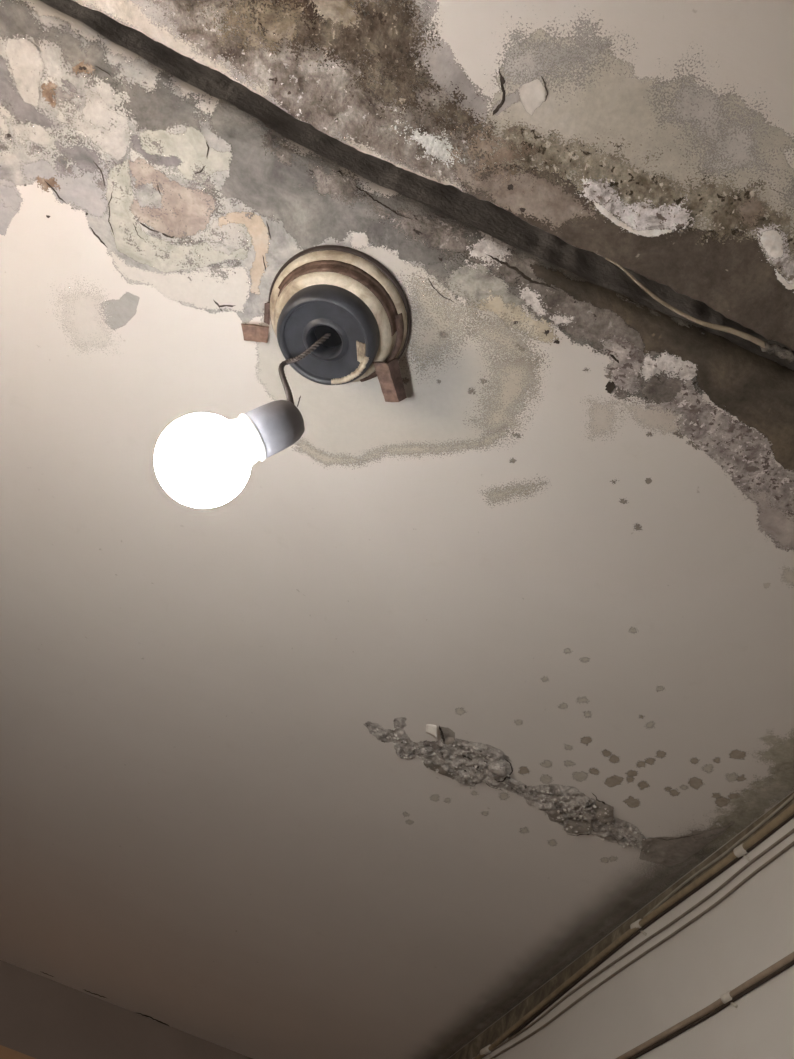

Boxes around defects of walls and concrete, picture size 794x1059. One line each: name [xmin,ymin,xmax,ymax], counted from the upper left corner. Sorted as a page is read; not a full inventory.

leakage [73,0,137,28]
flaking render [0,0,356,324]
leakage [127,0,376,122]
spalling [356,341,366,363]
crack [40,0,794,370]
flaking render [75,0,794,351]
leakage [209,99,794,552]
leakage [382,0,794,293]
spalling [530,264,794,472]
leakage [412,730,794,1059]